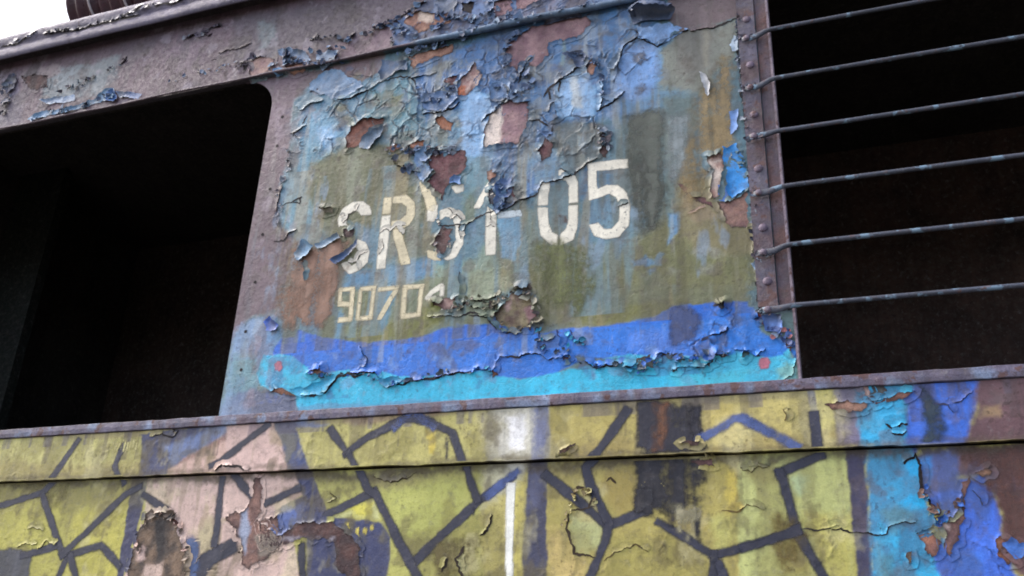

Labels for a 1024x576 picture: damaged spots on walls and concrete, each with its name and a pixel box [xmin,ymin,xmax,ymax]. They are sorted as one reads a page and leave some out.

peeling [636,22,688,44]
peeling [0,58,142,121]
peeling [168,0,624,200]
peeling [677,14,768,270]
peeling [484,166,519,212]
peeling [294,203,357,264]
peeling [427,280,770,377]
peeling [266,361,449,401]
peeling [825,385,922,418]
peeling [125,506,191,576]
peeling [221,474,365,576]
peeling [900,461,999,570]